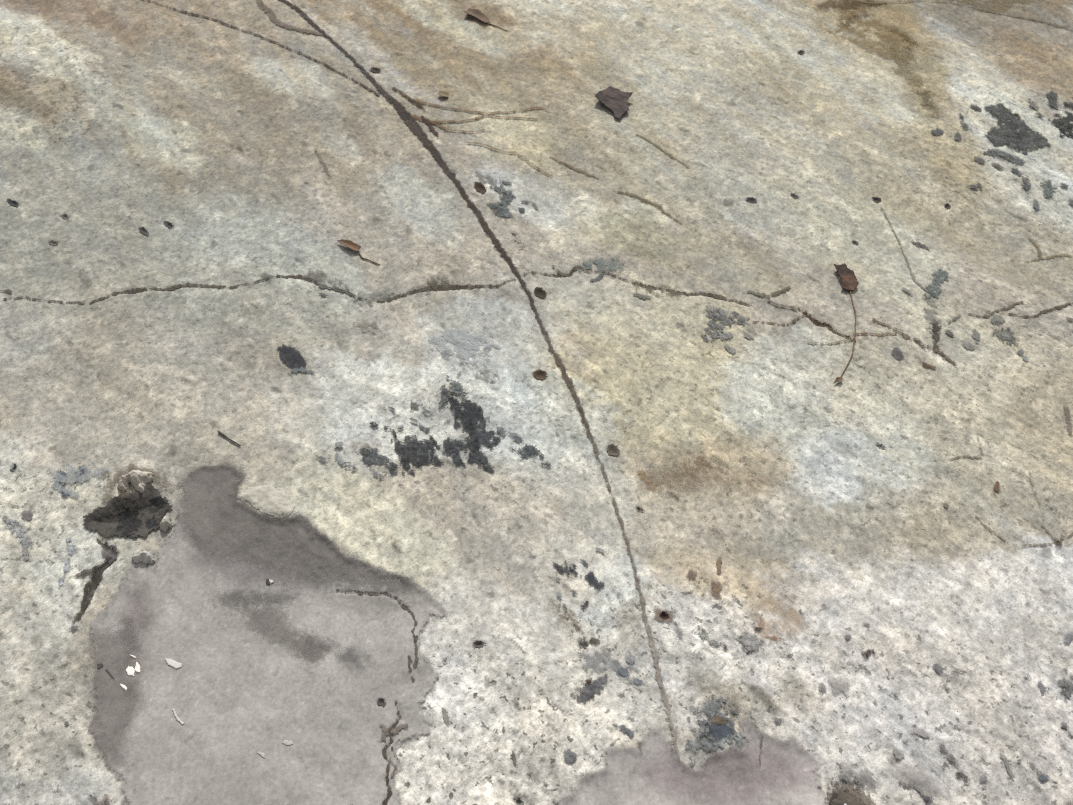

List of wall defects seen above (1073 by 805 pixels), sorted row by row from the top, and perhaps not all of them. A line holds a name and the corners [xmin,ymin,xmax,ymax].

damp [931,91,1073,209]
crack [881,207,926,291]
crack [1,0,897,762]
crack [950,436,983,460]
spalling [83,462,447,805]
damp [552,559,651,704]
crack [336,589,419,805]
damp [563,749,577,762]
damp [685,694,745,765]
damp [824,766,876,805]
damp [940,744,987,782]
damp [1000,753,1058,784]